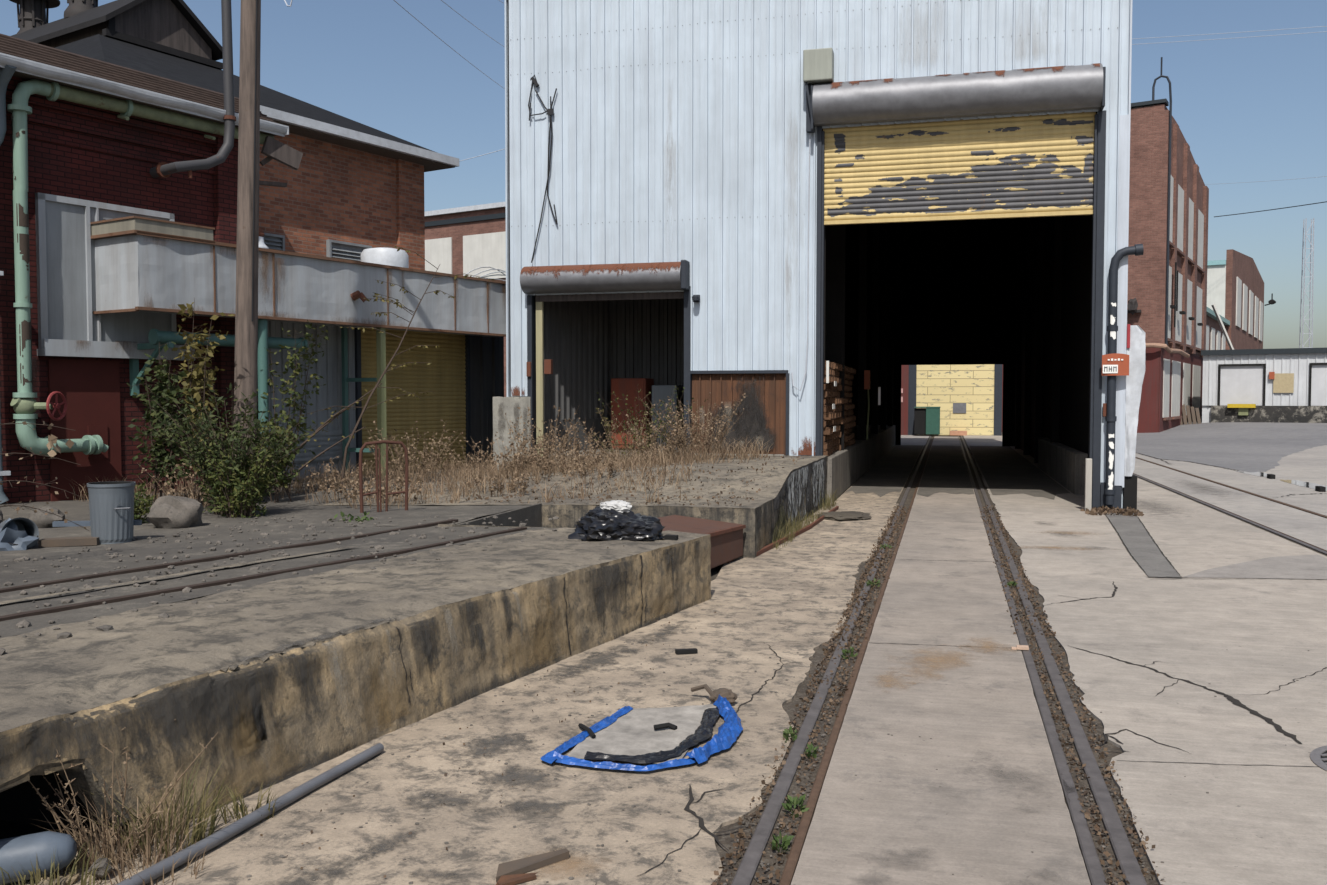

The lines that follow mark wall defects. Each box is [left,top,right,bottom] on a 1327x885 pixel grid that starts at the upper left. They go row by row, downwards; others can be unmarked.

peeling [827,119,1094,217]
peeling [16,203,30,271]
corrosion [520,262,681,279]
peeling [19,320,33,386]
crack [1047,581,1118,605]
damp [529,603,677,677]
damp [0,651,318,800]
damp [466,731,523,765]
crack [1099,729,1189,753]
crack [1070,646,1327,744]
damp [483,769,564,813]
crack [638,785,749,876]